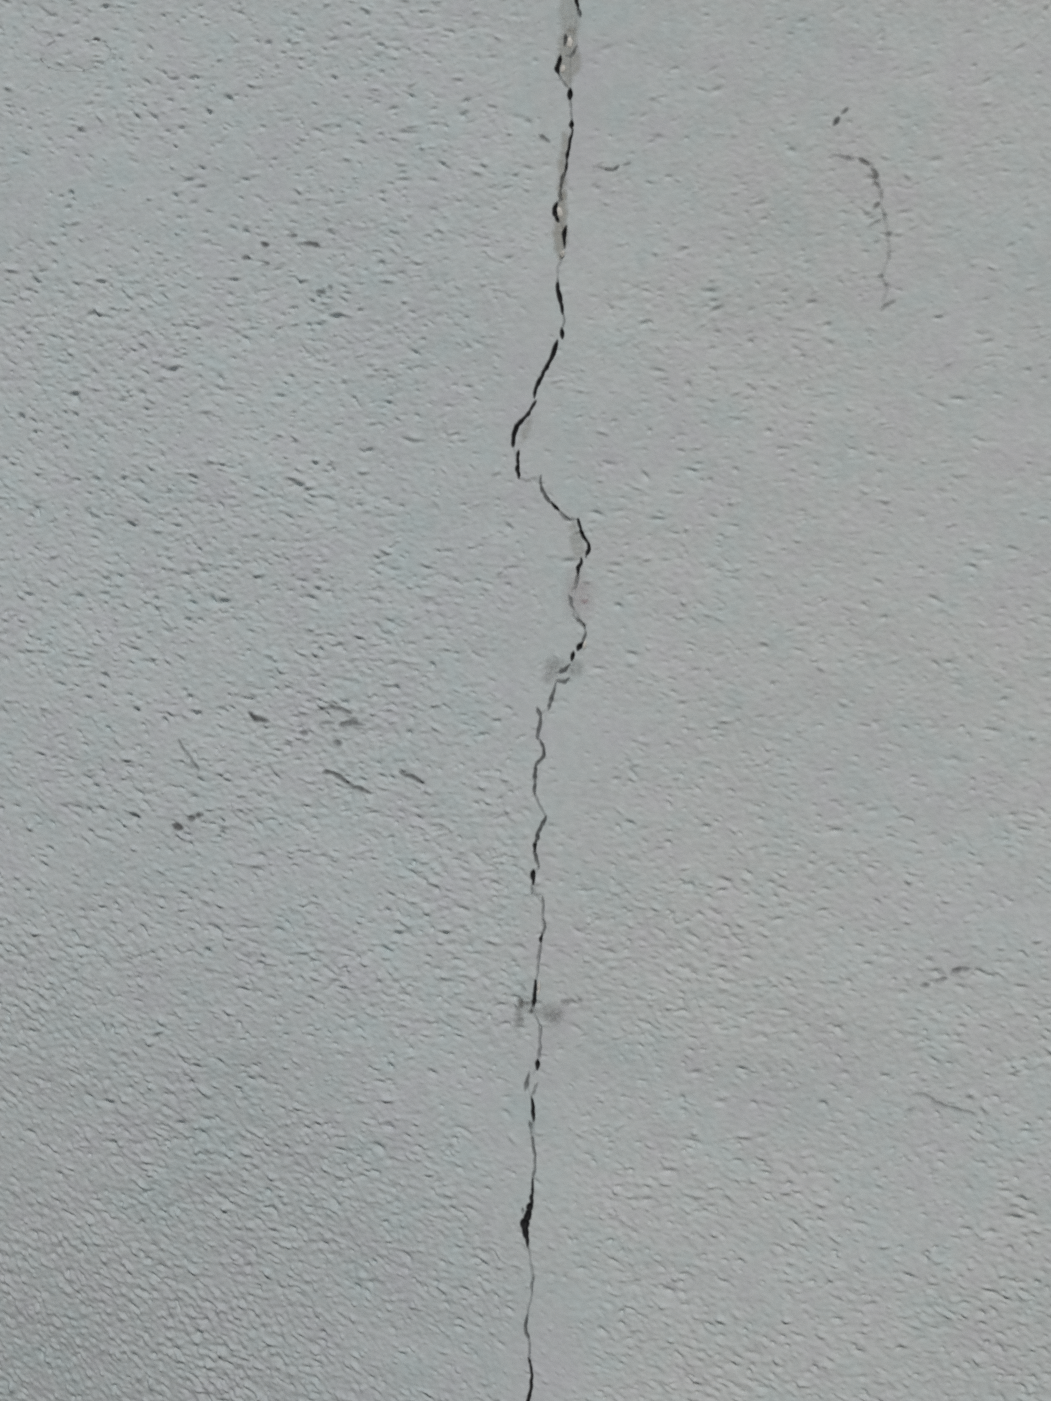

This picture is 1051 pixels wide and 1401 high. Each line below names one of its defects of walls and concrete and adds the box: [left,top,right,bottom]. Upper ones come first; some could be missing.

crack [511,0,590,575]
crack [530,619,586,885]
crack [532,980,540,1005]
crack [520,1060,540,1247]
crack [525,1318,533,1401]